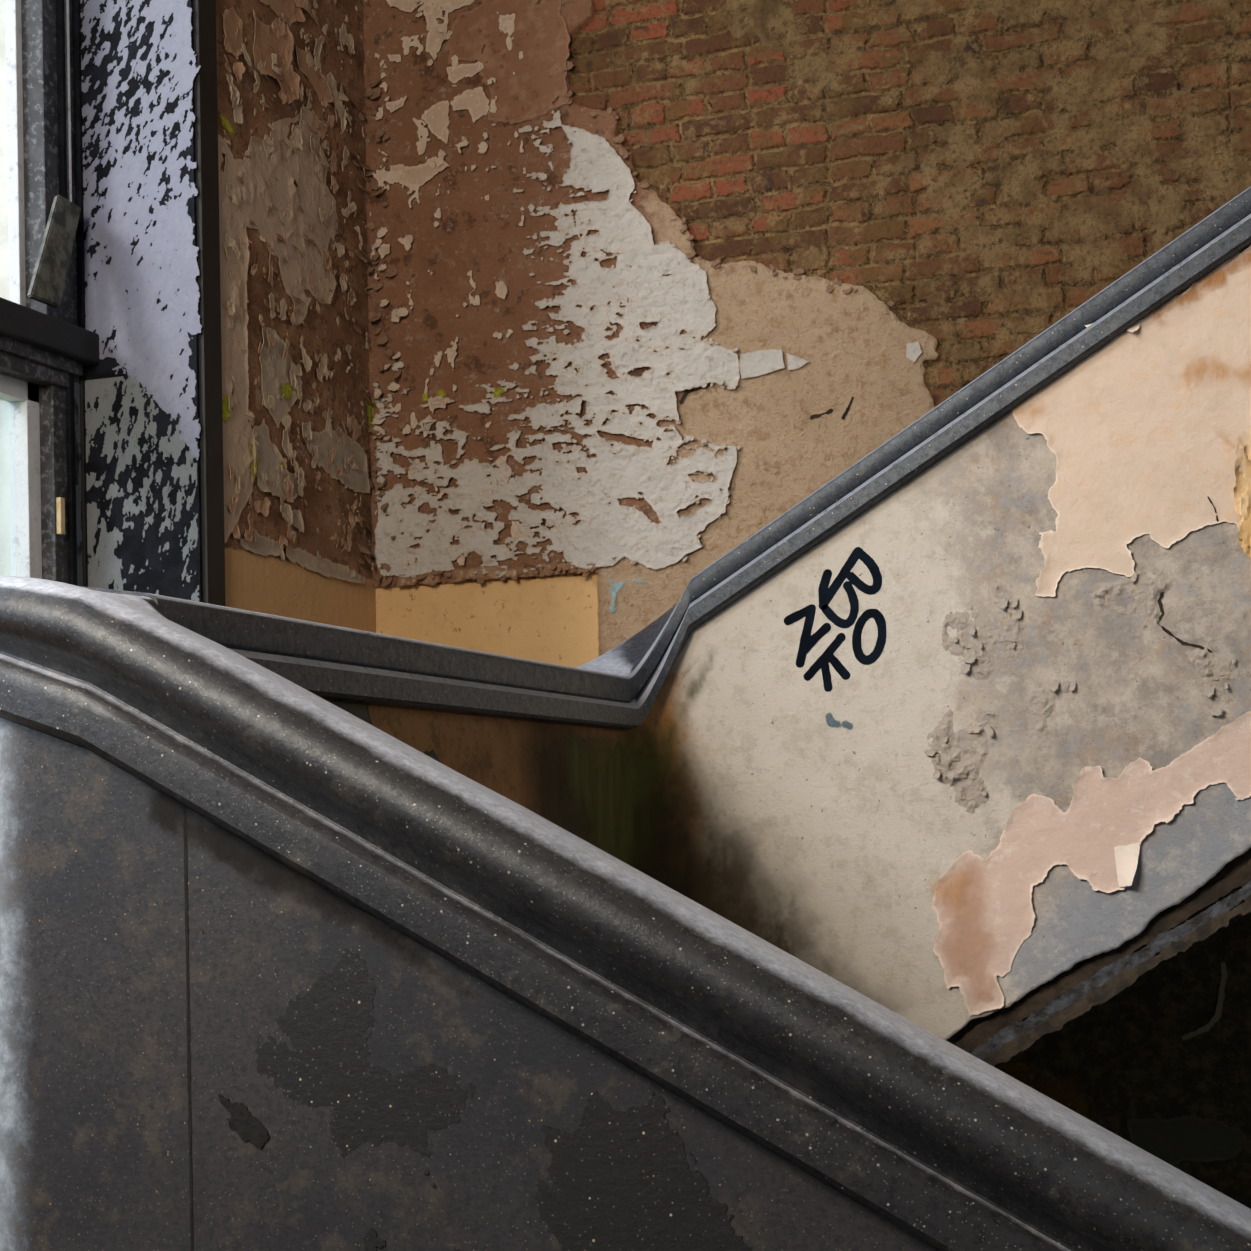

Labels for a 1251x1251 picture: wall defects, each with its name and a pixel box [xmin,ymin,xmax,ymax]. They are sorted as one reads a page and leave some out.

peeling [74,0,202,602]
flaking render [218,0,1251,597]
crack [1157,592,1212,653]
peeling [932,711,1251,1067]
spalling [218,1094,270,1150]